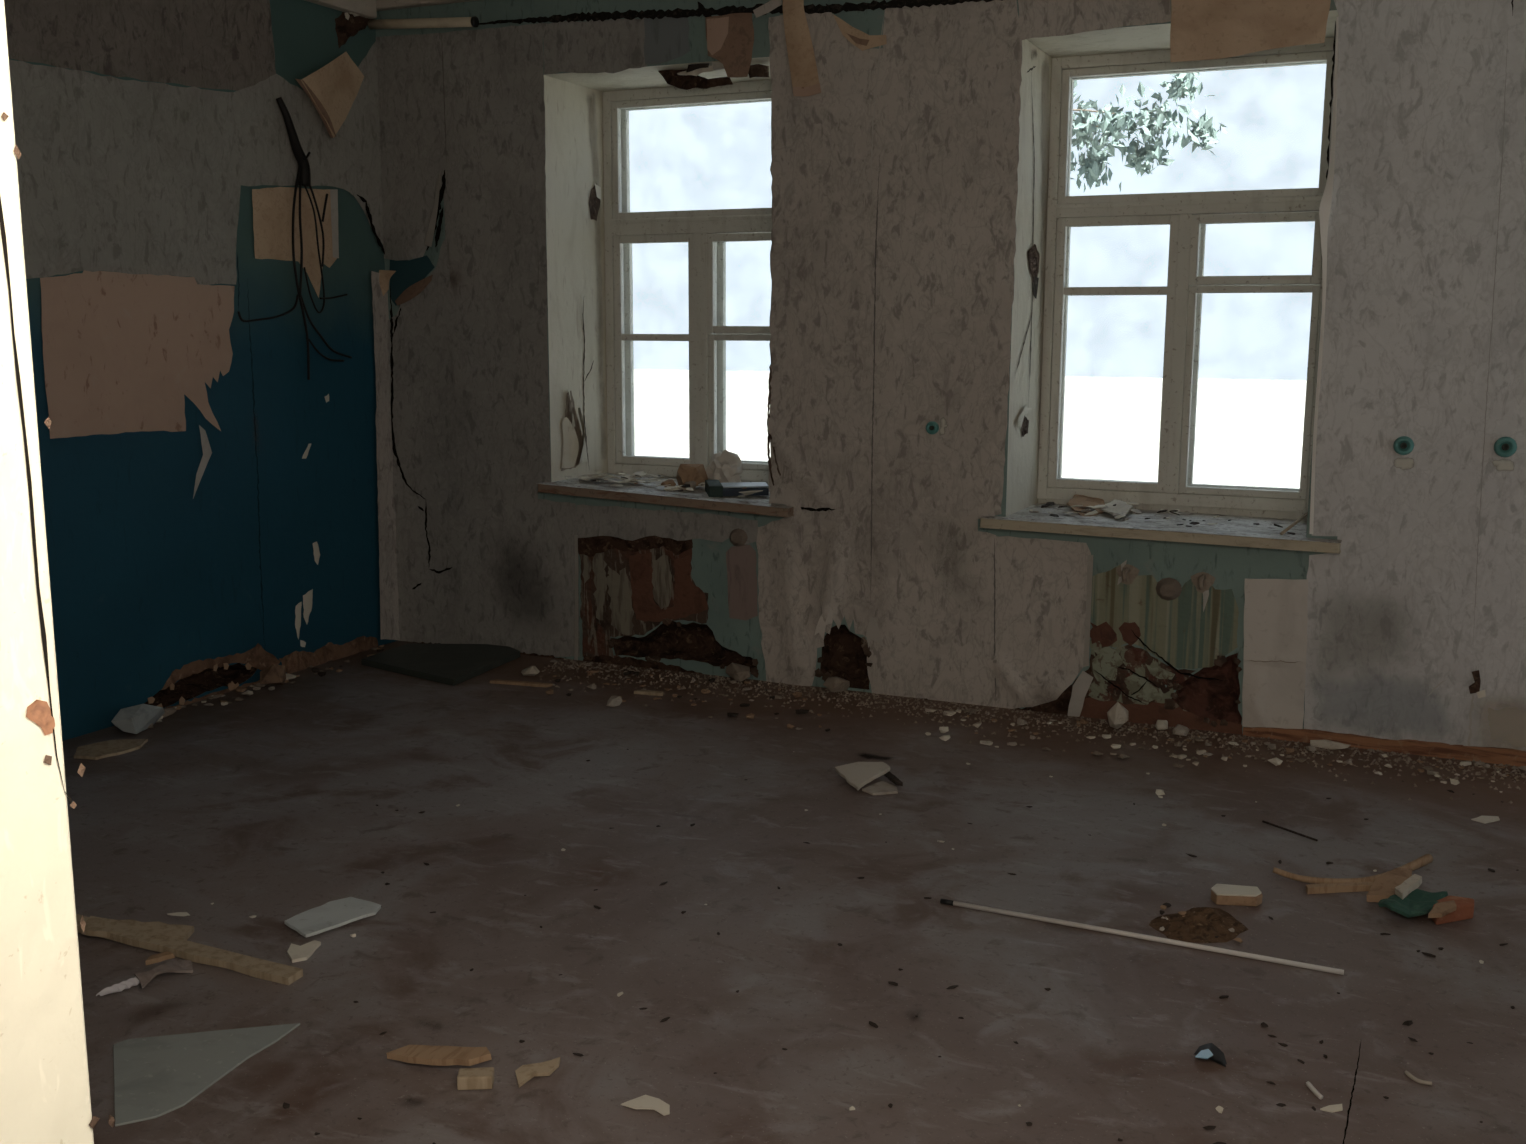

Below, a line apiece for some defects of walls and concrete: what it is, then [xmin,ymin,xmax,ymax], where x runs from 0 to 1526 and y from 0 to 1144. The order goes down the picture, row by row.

spalling [335,12,372,48]
crack [479,0,1003,25]
crack [435,208,443,247]
peeling [193,425,212,498]
crack [390,289,452,589]
spalling [578,536,759,678]
spalling [144,589,378,709]
spalling [815,625,873,690]
peeling [1015,560,1243,735]
spalling [26,699,55,735]
spalling [89,1114,115,1130]